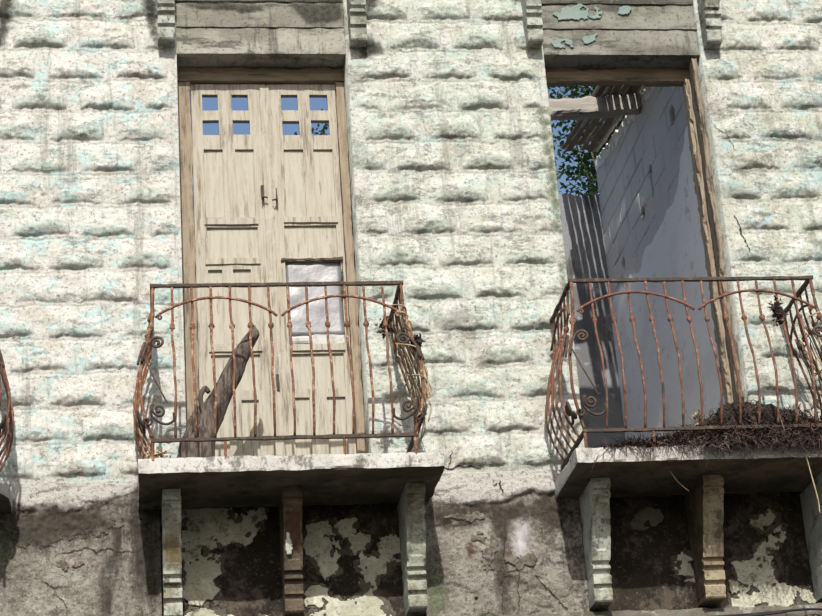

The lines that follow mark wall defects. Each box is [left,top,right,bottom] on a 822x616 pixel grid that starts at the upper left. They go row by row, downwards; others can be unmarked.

peeling [552,3,603,21]
peeling [618,6,632,15]
peeling [629,506,664,530]
peeling [181,506,270,616]
peeling [302,514,401,616]
crack [496,534,568,614]
peeling [670,547,696,585]
peeling [725,508,820,616]